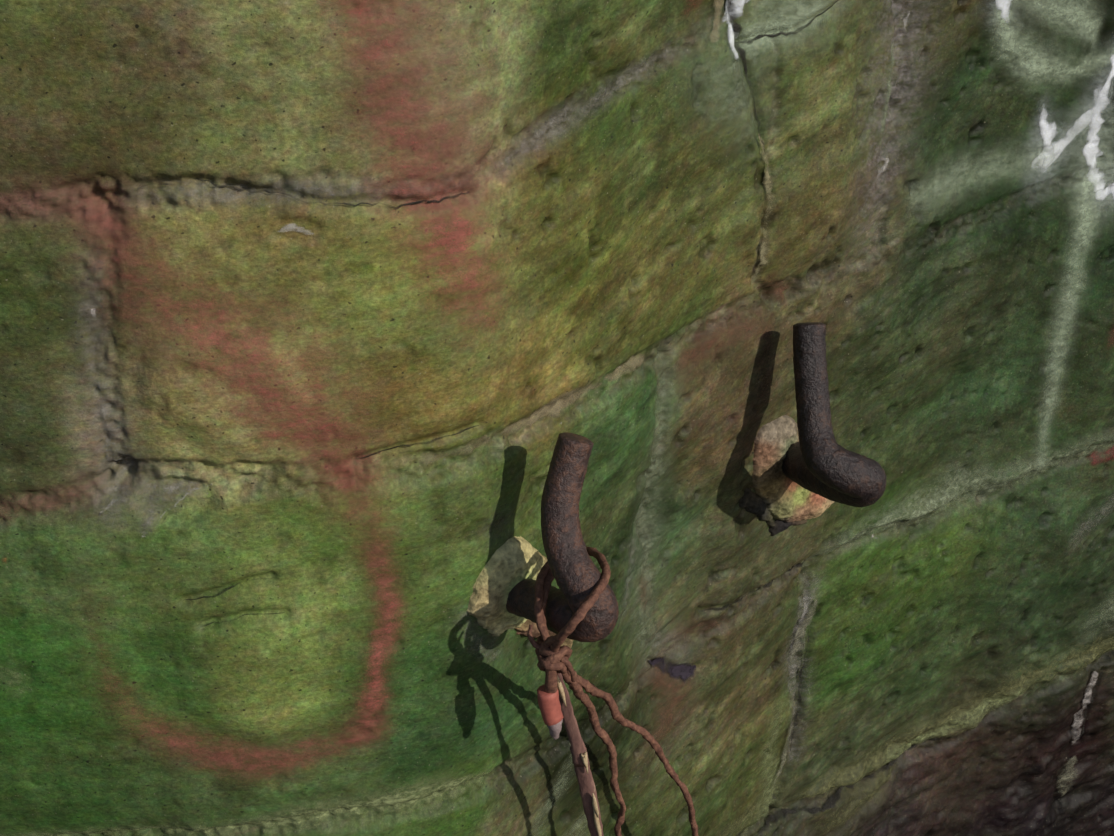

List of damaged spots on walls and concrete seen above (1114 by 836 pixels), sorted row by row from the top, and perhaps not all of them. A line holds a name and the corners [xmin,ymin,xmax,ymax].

crack [727,0,839,75]
crack [754,104,773,208]
crack [754,235,769,278]